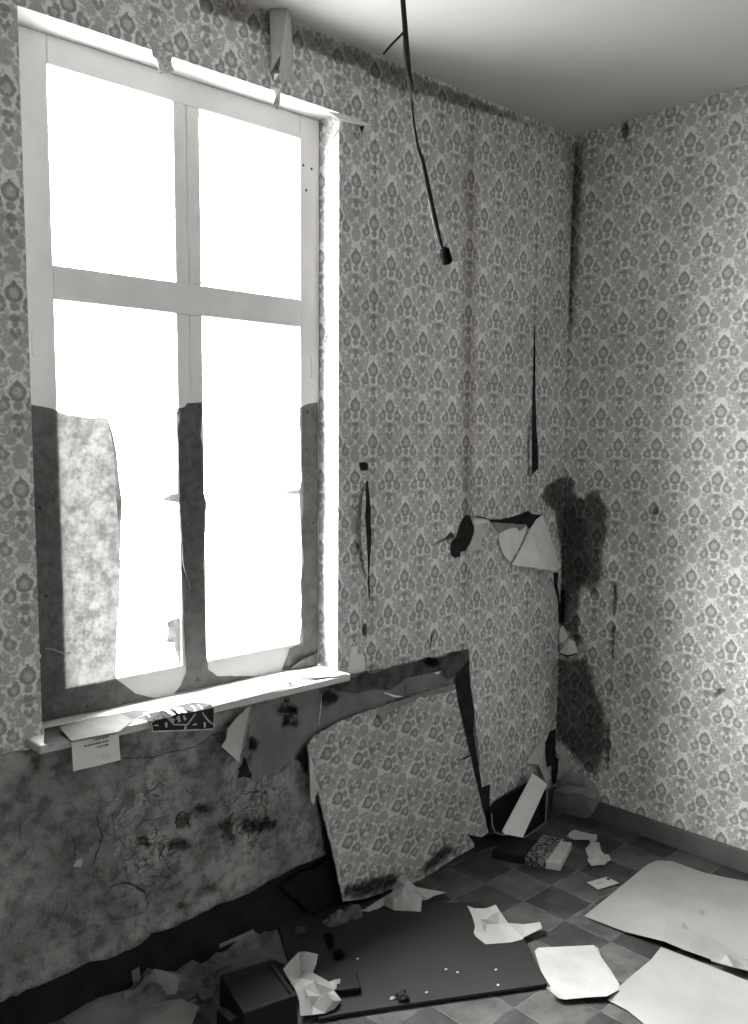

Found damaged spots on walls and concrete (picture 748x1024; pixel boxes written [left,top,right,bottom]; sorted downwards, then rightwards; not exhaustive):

spalling [437,515,490,558]
damp [543,478,606,643]
damp [278,699,298,727]
damp [557,660,610,770]
spalling [238,757,252,778]
spalling [455,659,490,833]
crack [72,731,225,867]
spalling [178,804,209,827]
spalling [222,820,267,838]